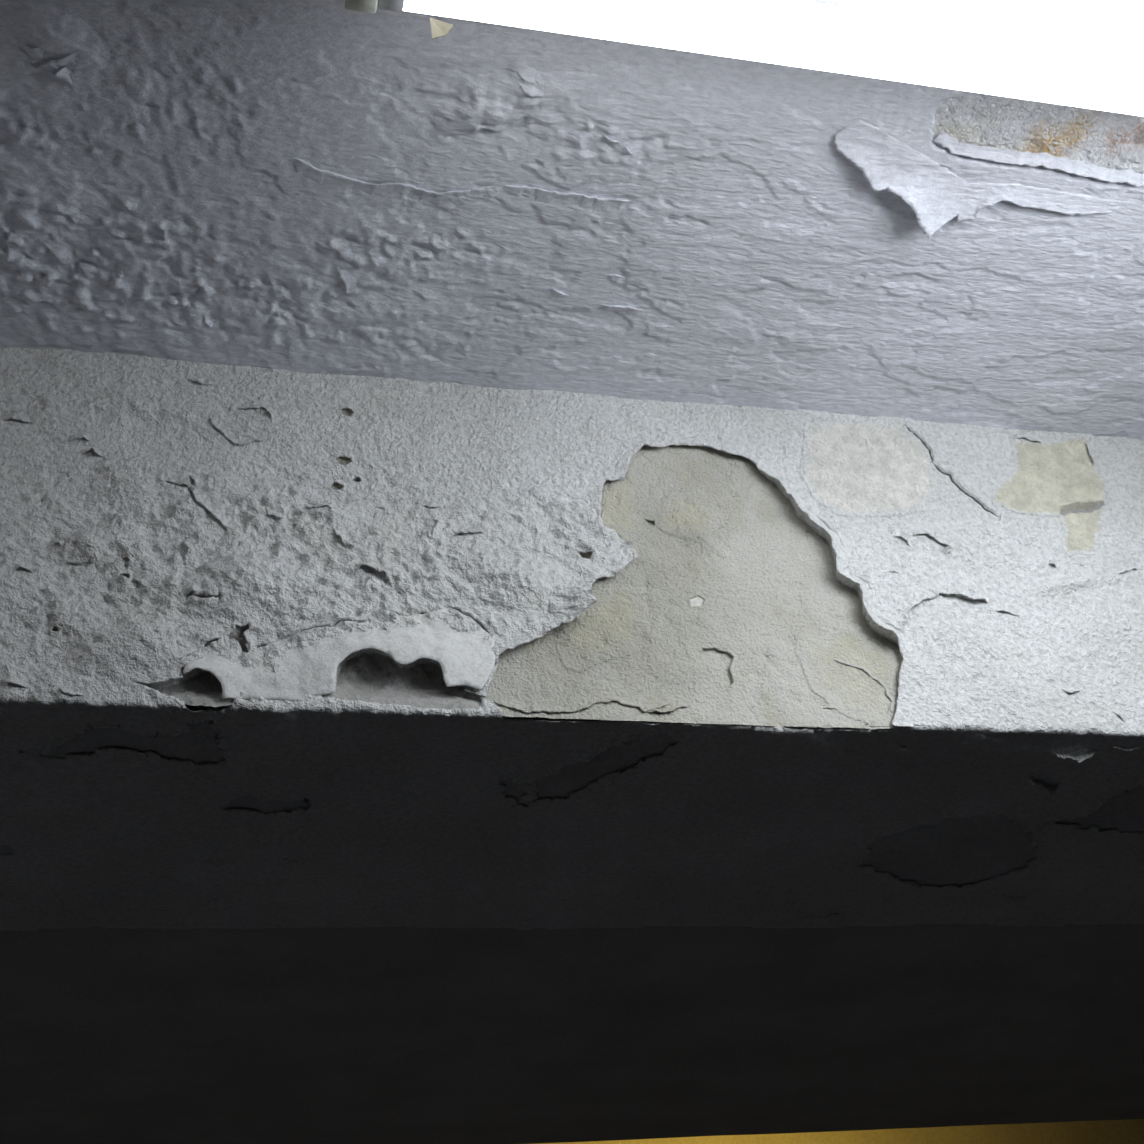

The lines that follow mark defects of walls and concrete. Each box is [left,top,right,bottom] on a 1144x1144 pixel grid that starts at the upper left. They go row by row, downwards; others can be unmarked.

peeling [834,119,1130,238]
flaking render [932,95,1144,187]
corrosion [1002,106,1144,169]
crack [903,423,1001,521]
flaking render [131,432,921,755]